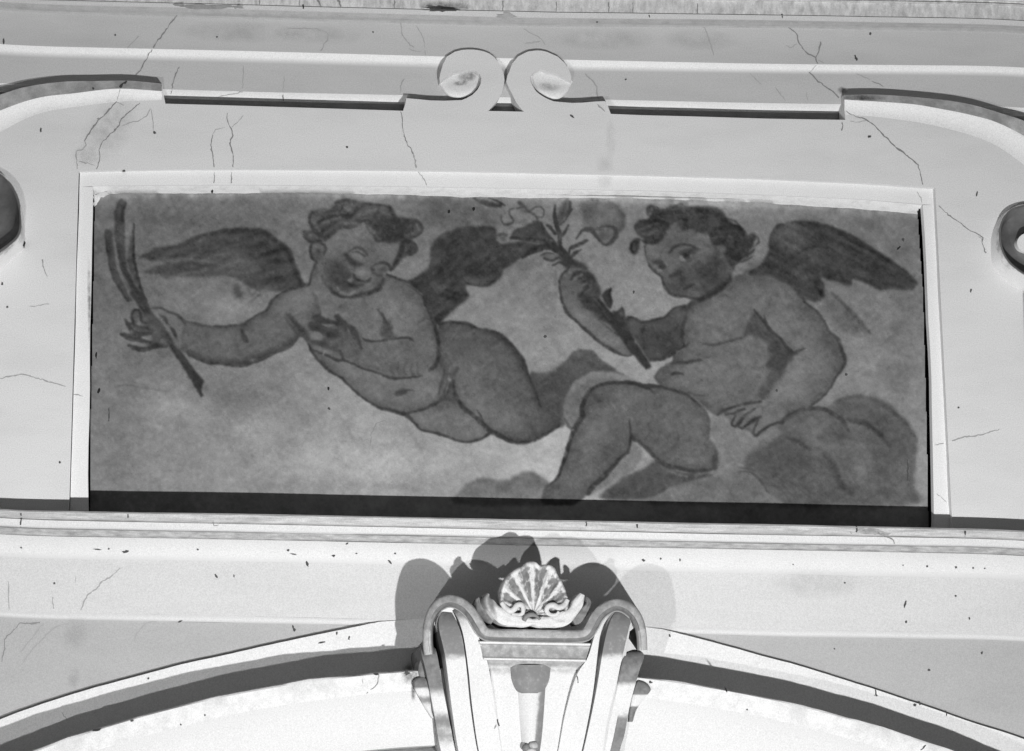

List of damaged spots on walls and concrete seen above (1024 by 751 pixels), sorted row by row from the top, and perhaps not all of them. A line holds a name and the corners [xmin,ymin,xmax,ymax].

crack [75,15,180,169]
crack [210,66,244,183]
crack [400,79,427,185]
crack [750,14,987,253]
crack [0,374,81,396]
crack [937,429,999,445]
crack [2,568,120,663]